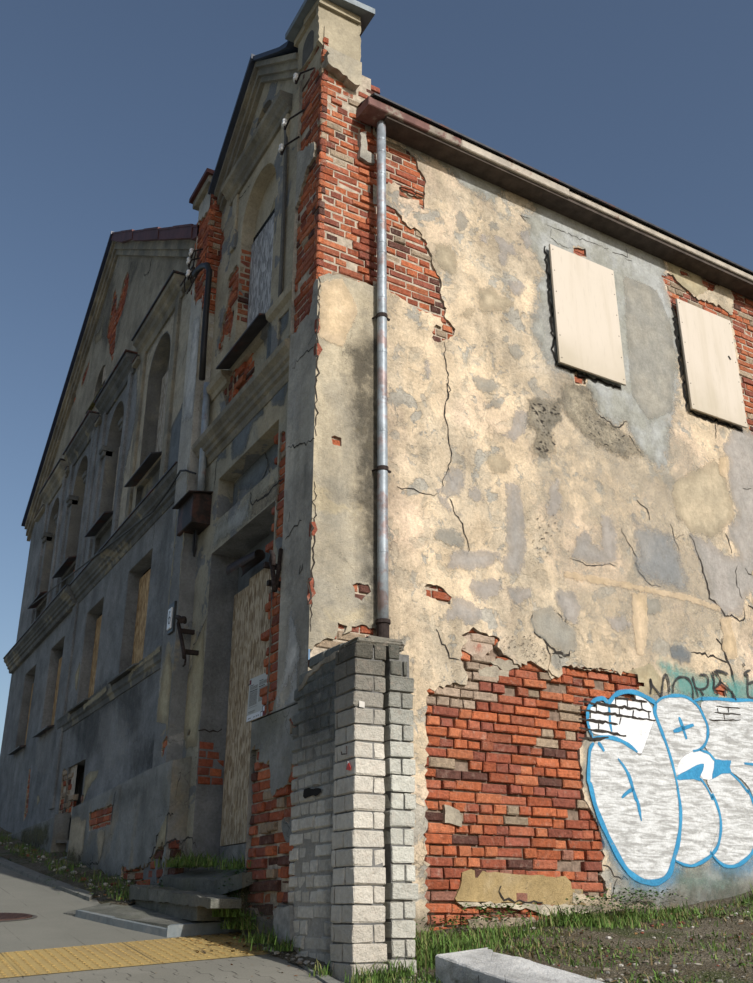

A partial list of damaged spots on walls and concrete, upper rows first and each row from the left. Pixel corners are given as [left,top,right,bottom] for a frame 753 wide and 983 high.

flaking render [266,26,506,359]
flaking render [102,272,129,383]
peeling [117,194,225,529]
flaking render [218,249,251,354]
peeling [214,431,286,553]
flaking render [259,575,281,715]
crack [397,343,470,552]
flaking render [423,202,753,931]
crack [571,532,660,587]
crack [637,500,752,683]
flaking render [59,764,113,863]
flaking render [246,745,298,923]